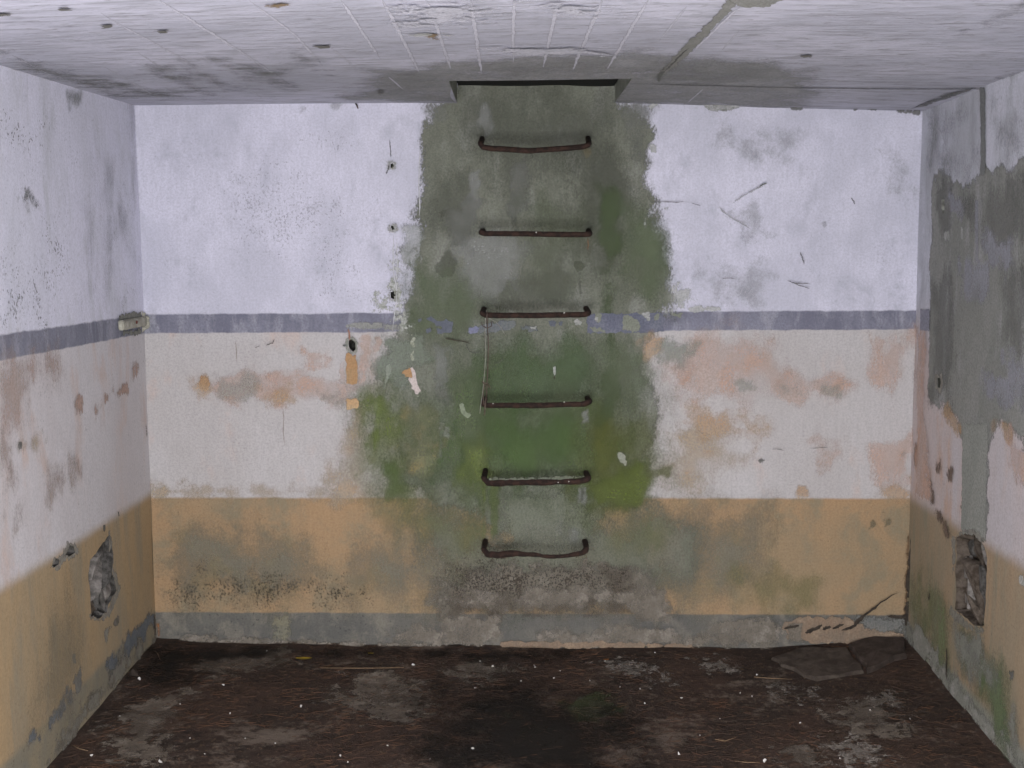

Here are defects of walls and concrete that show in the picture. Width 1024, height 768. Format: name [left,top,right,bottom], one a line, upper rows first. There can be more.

water stain [385,1,497,29]
water stain [171,47,816,624]
water stain [928,155,1024,541]
spalling [29,525,156,768]
crack [784,536,930,634]
spalling [949,529,987,634]